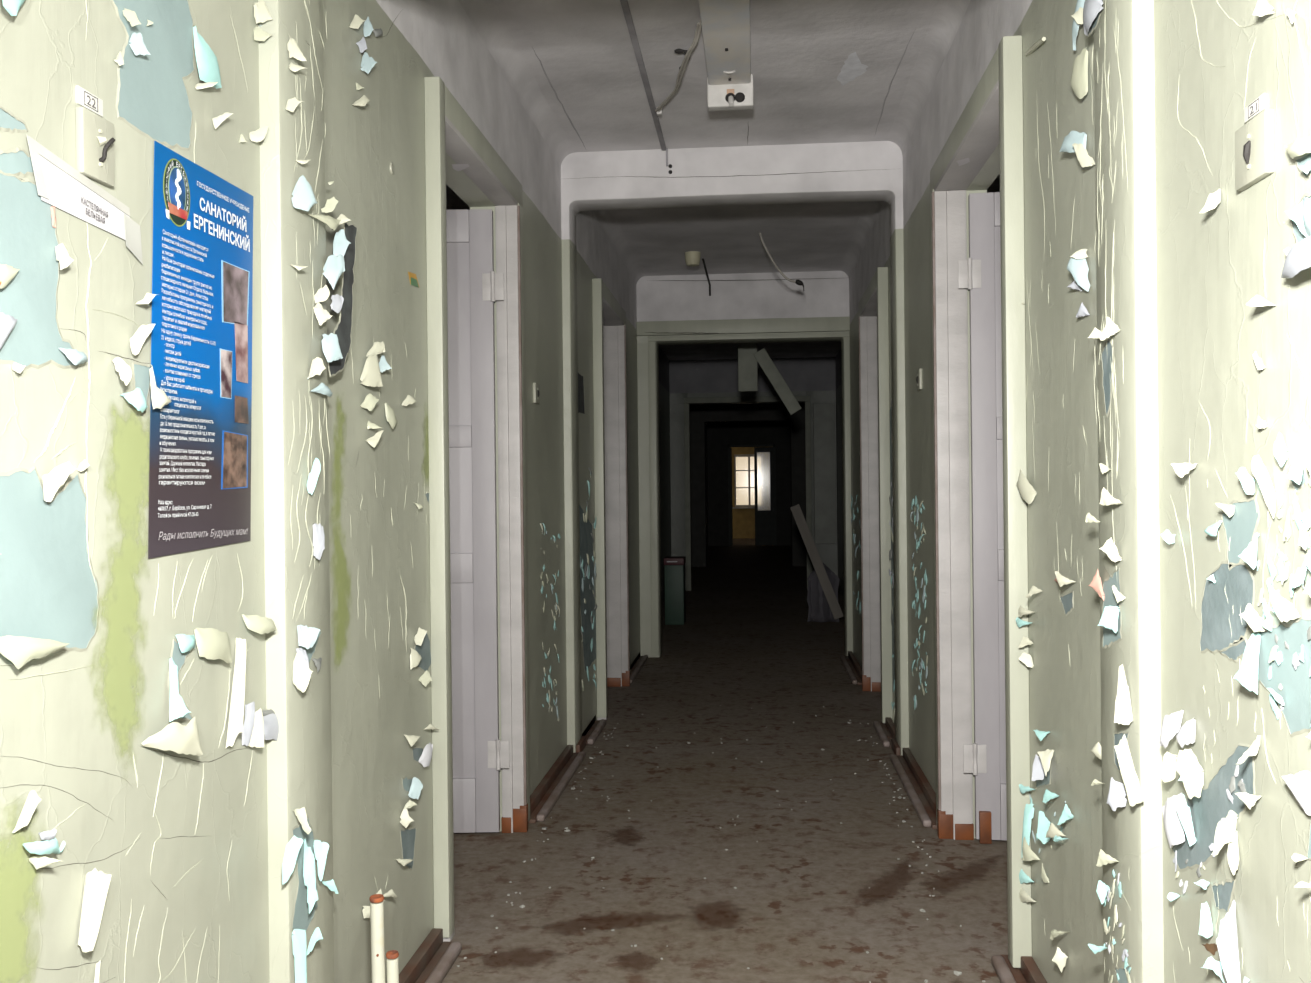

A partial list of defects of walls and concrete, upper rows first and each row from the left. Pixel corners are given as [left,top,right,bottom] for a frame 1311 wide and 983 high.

peeling [253,0,357,397]
crack [1177,85,1213,176]
crack [1191,0,1311,137]
peeling [0,105,172,680]
mould [100,410,150,753]
crack [154,554,243,621]
peeling [4,614,279,832]
crack [124,814,232,983]
peeling [282,807,339,983]
peeling [1019,730,1074,903]
peeling [1091,664,1143,811]
peeling [1159,401,1311,983]